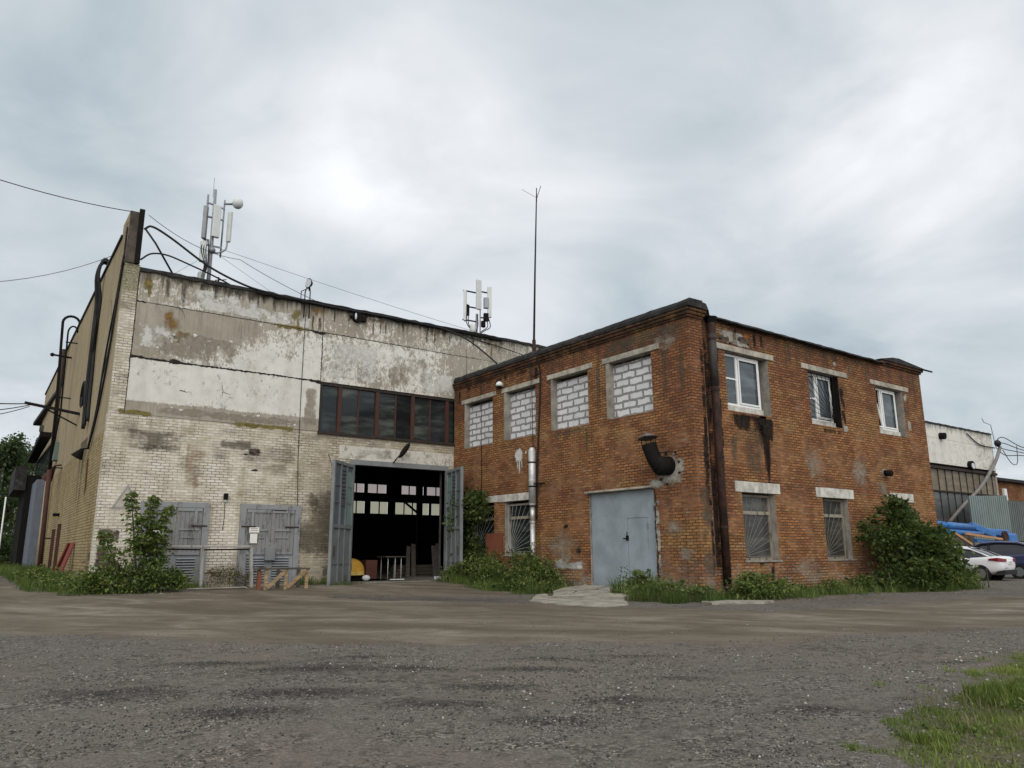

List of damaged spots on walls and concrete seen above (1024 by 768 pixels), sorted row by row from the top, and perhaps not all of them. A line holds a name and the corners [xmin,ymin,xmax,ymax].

water stain [167,279,278,308]
peeling [196,290,325,335]
peeling [140,322,233,366]
spalling [716,330,749,348]
water stain [222,440,250,449]
water stain [700,338,773,570]
spalling [649,452,684,575]